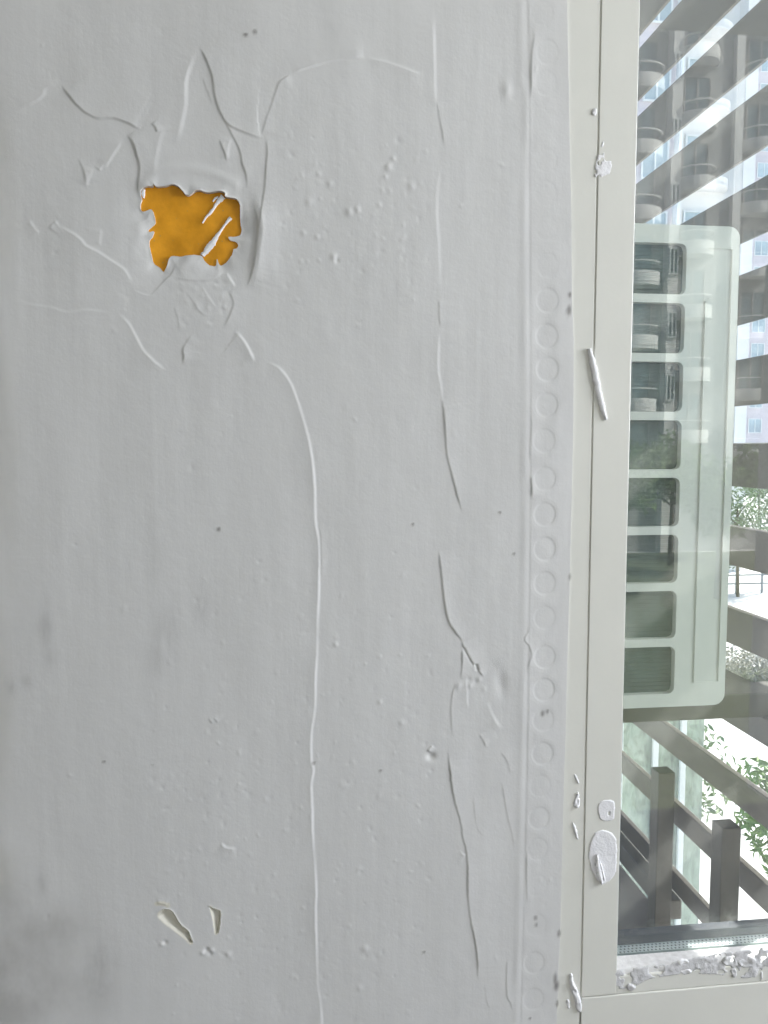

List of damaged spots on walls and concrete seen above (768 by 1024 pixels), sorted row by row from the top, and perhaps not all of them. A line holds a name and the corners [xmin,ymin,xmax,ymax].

crack [11,40,270,227]
flaking render [134,160,266,299]
crack [429,9,467,518]
crack [11,215,326,1024]
crack [436,544,530,1015]
spalling [154,901,193,945]
spalling [209,906,222,935]